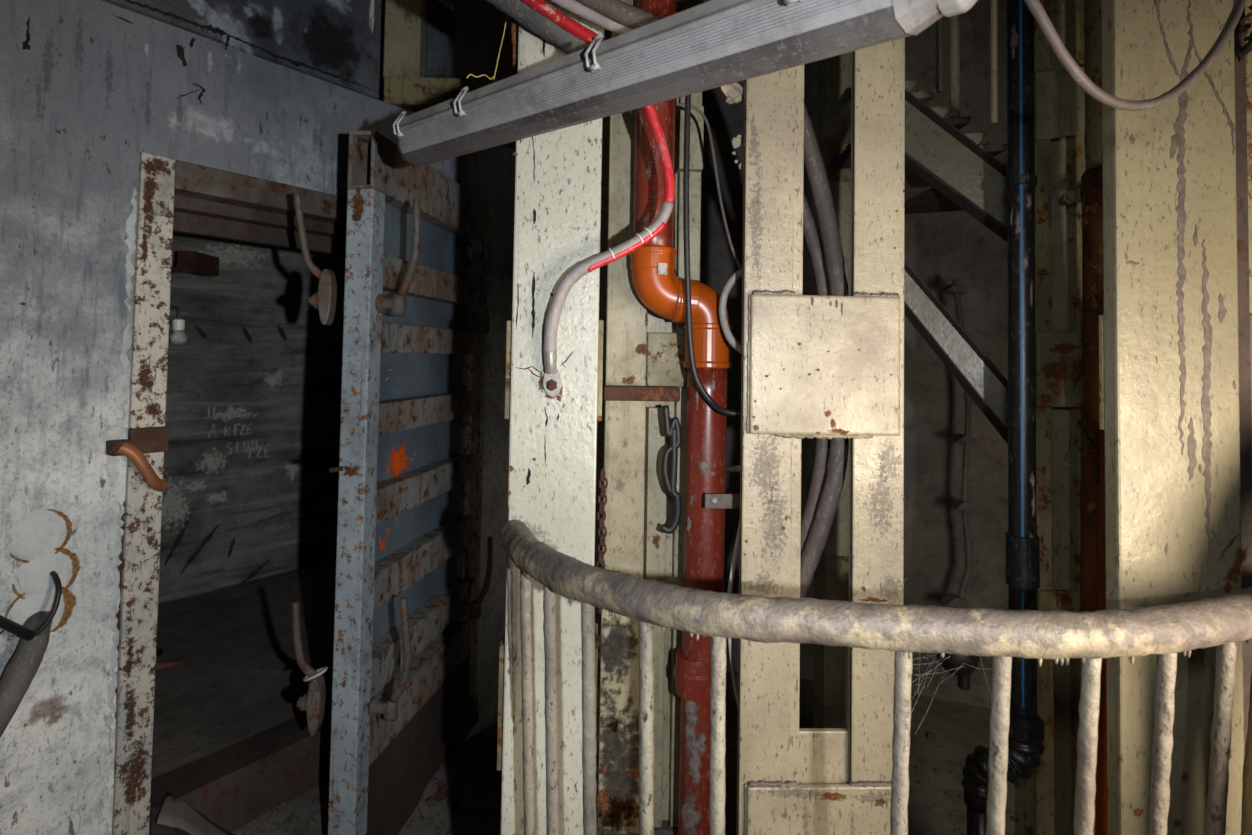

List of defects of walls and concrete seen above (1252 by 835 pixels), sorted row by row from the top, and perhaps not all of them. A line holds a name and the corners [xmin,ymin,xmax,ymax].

rust [142,157,171,266]
rust [138,356,160,418]
rust [1224,544,1250,593]